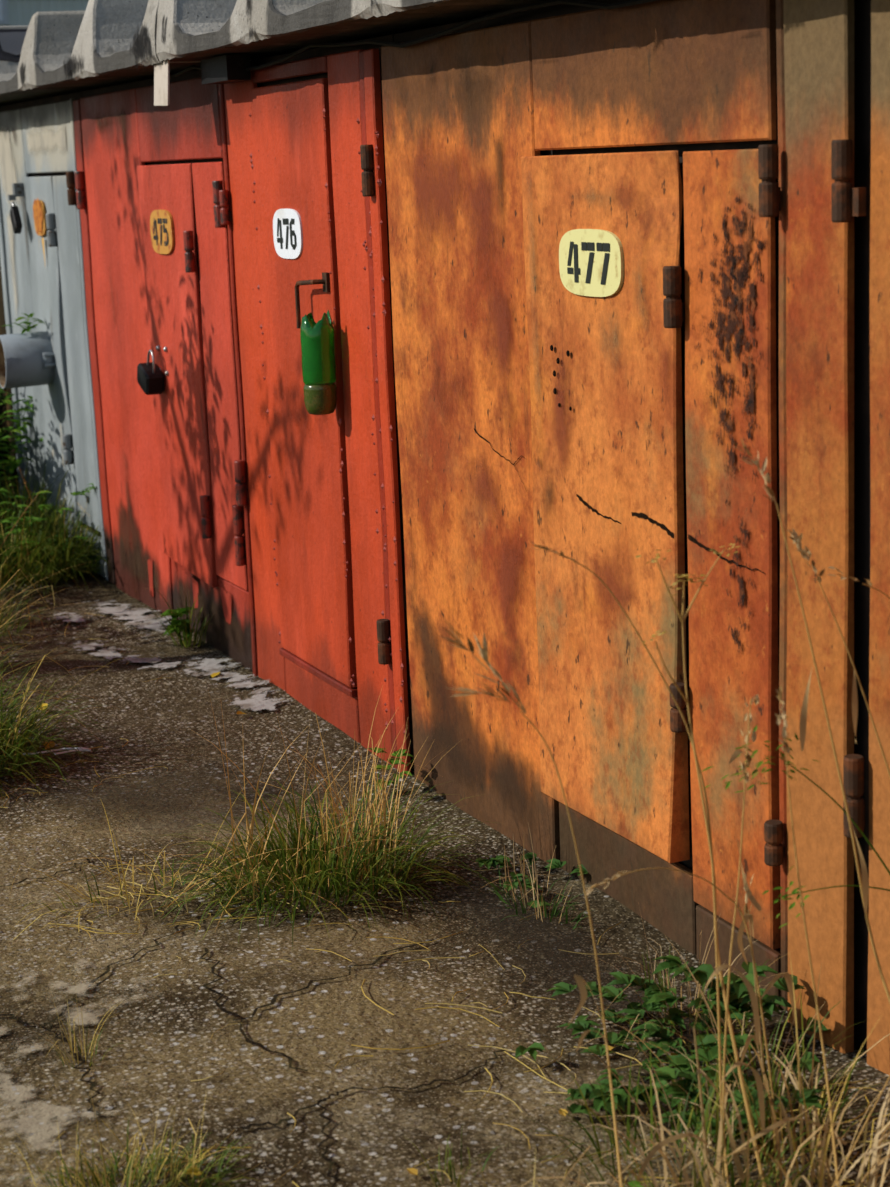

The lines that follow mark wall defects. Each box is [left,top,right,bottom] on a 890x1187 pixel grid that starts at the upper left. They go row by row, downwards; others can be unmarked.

corrosion [696,191,766,477]
crack [474,429,525,487]
corrosion [554,372,566,458]
crack [576,494,764,573]
corrosion [726,516,753,652]